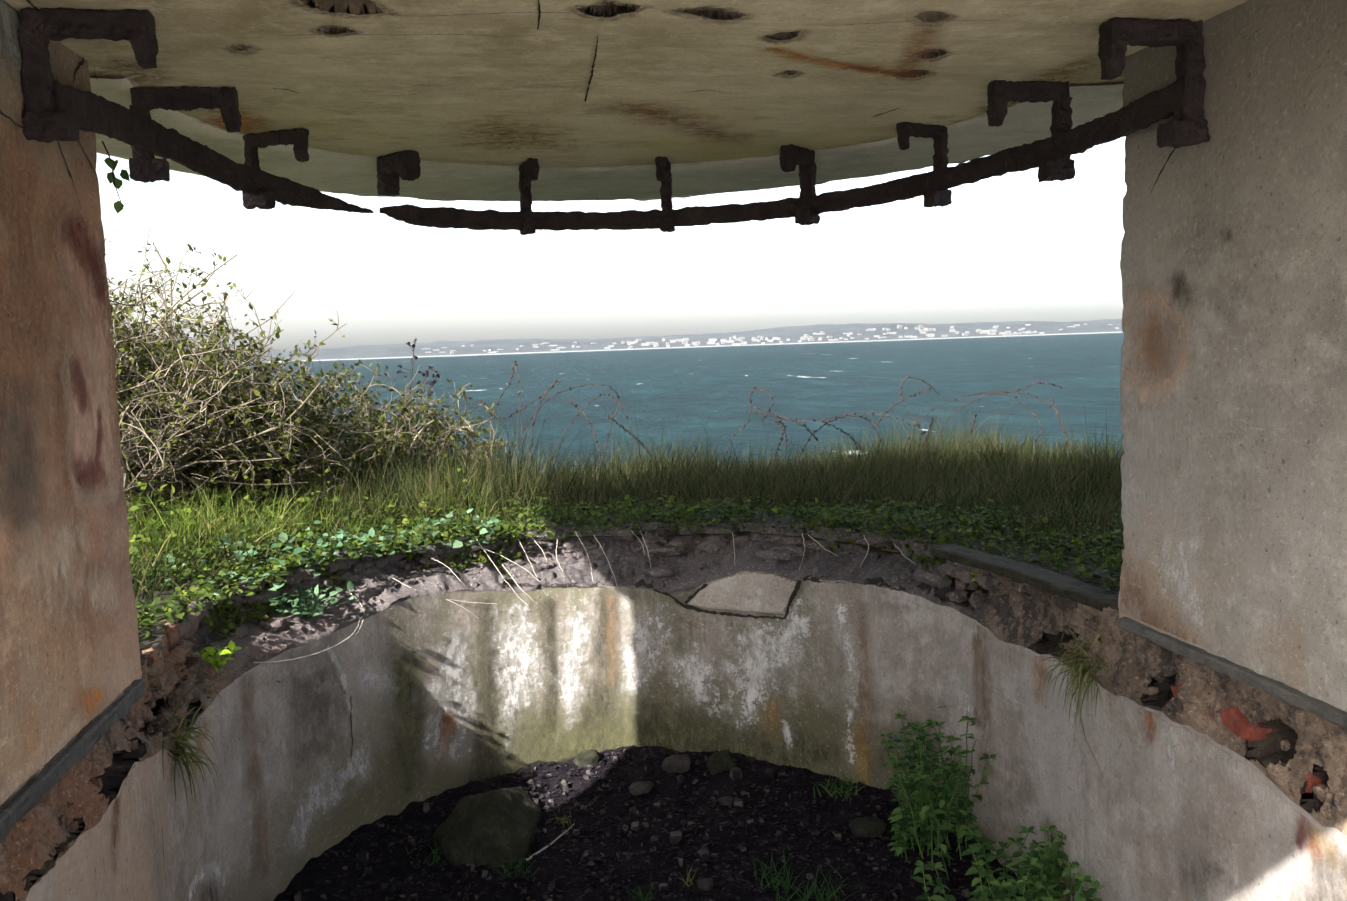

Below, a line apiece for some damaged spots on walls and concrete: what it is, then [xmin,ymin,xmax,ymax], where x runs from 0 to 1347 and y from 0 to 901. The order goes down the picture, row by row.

spalling [665,6,746,24]
crack [585,36,598,102]
rust [766,31,935,76]
crack [0,110,24,129]
crack [501,575,907,620]
damp [422,589,811,782]
damp [835,603,868,770]
spalling [1141,673,1177,708]
spalling [89,696,168,806]
spalling [1246,718,1298,767]
spalling [1300,766,1329,813]
spalling [0,817,85,901]